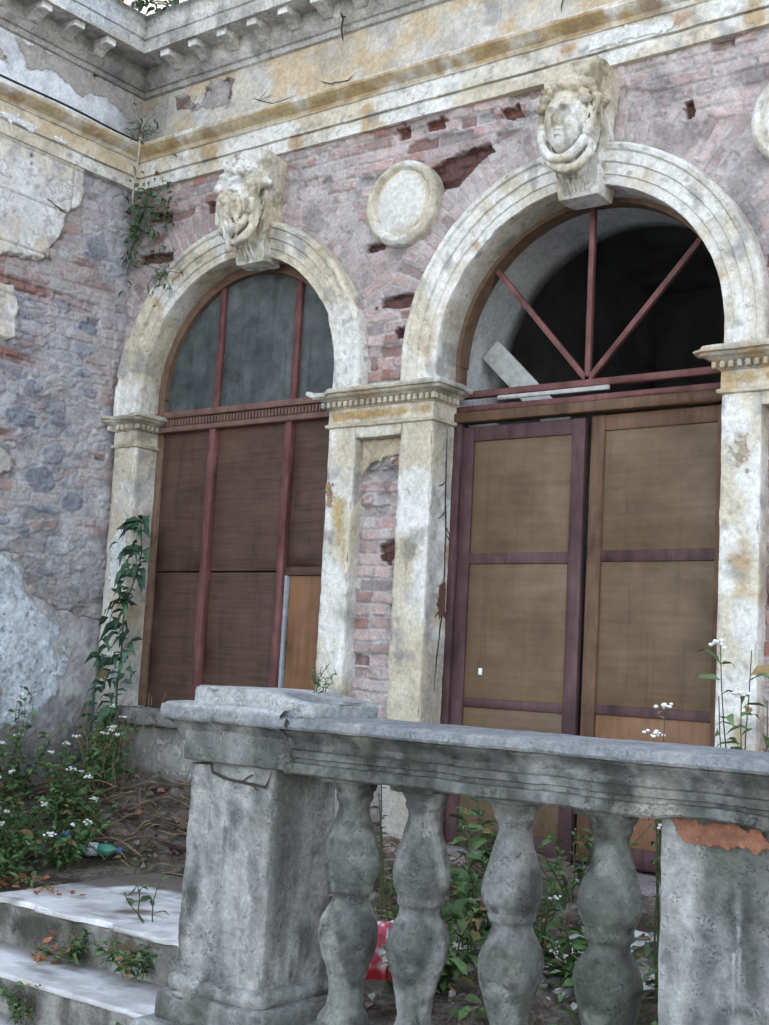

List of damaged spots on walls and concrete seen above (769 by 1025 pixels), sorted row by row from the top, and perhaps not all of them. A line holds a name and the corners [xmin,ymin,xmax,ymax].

crack [339,12,347,41]
peeling [17,39,136,121]
flaking render [174,77,235,112]
peeling [0,111,39,133]
flaking render [0,172,174,729]
peeling [360,437,401,477]
spalling [381,544,395,565]
spalling [673,817,769,855]